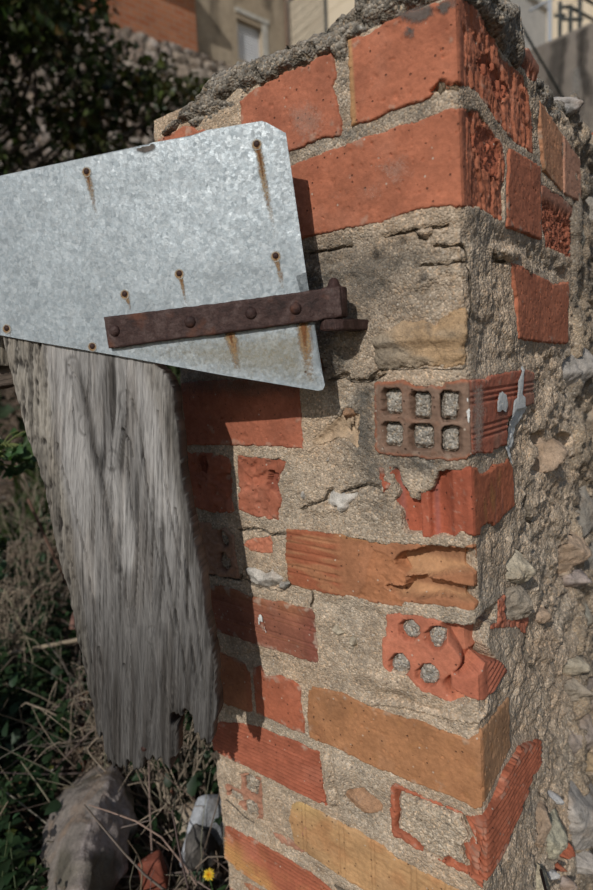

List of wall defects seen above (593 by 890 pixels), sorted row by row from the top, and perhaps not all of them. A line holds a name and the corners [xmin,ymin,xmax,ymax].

damp [548,37,565,97]
damp [573,28,591,106]